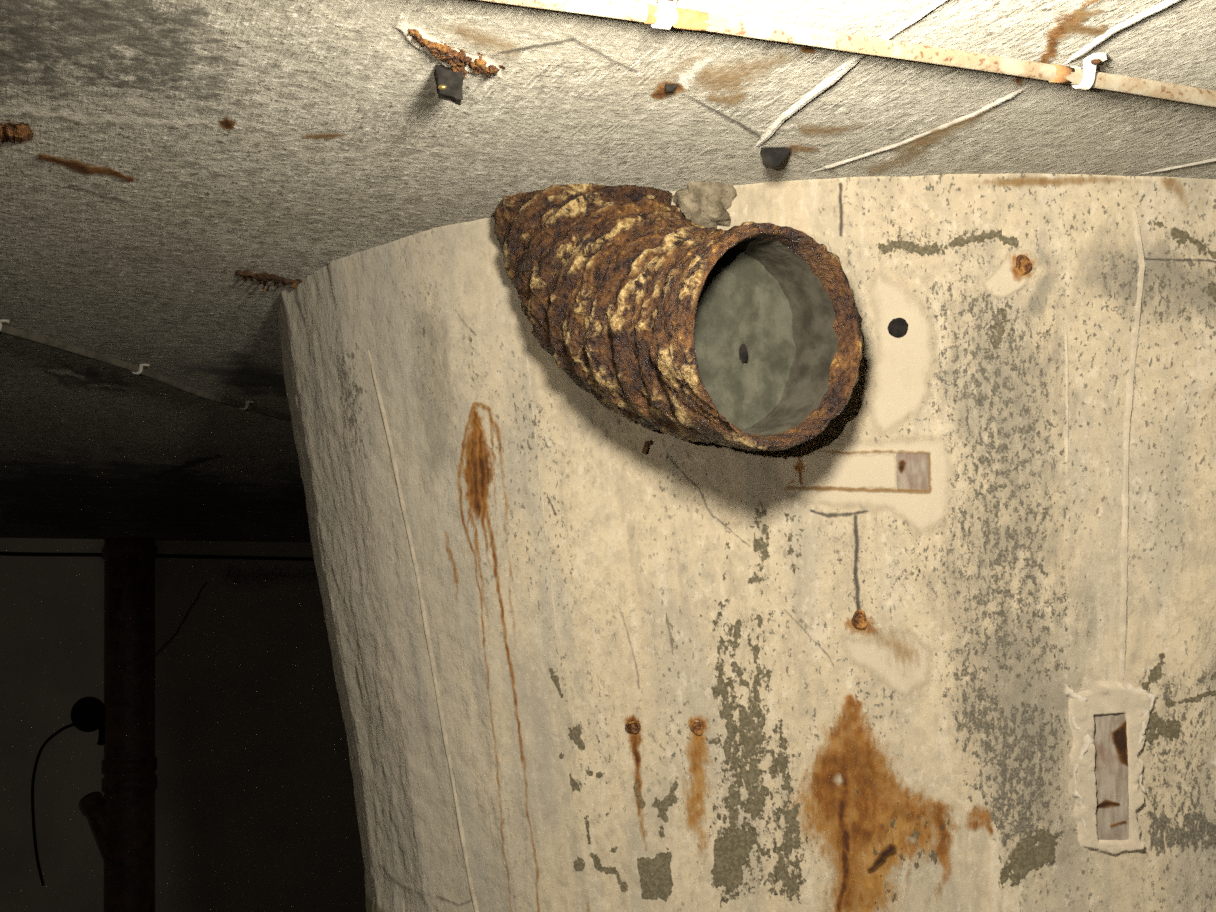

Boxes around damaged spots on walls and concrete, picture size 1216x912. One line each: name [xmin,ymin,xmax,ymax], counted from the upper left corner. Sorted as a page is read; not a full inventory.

water stain [0,0,227,128]
rust [1037,0,1106,84]
rust [0,122,34,144]
rust [38,154,134,203]
rust [235,270,303,292]
rust [458,403,527,786]
rust [626,715,644,835]
rust [687,717,708,844]
peeling [705,599,810,905]
rust [802,694,993,912]